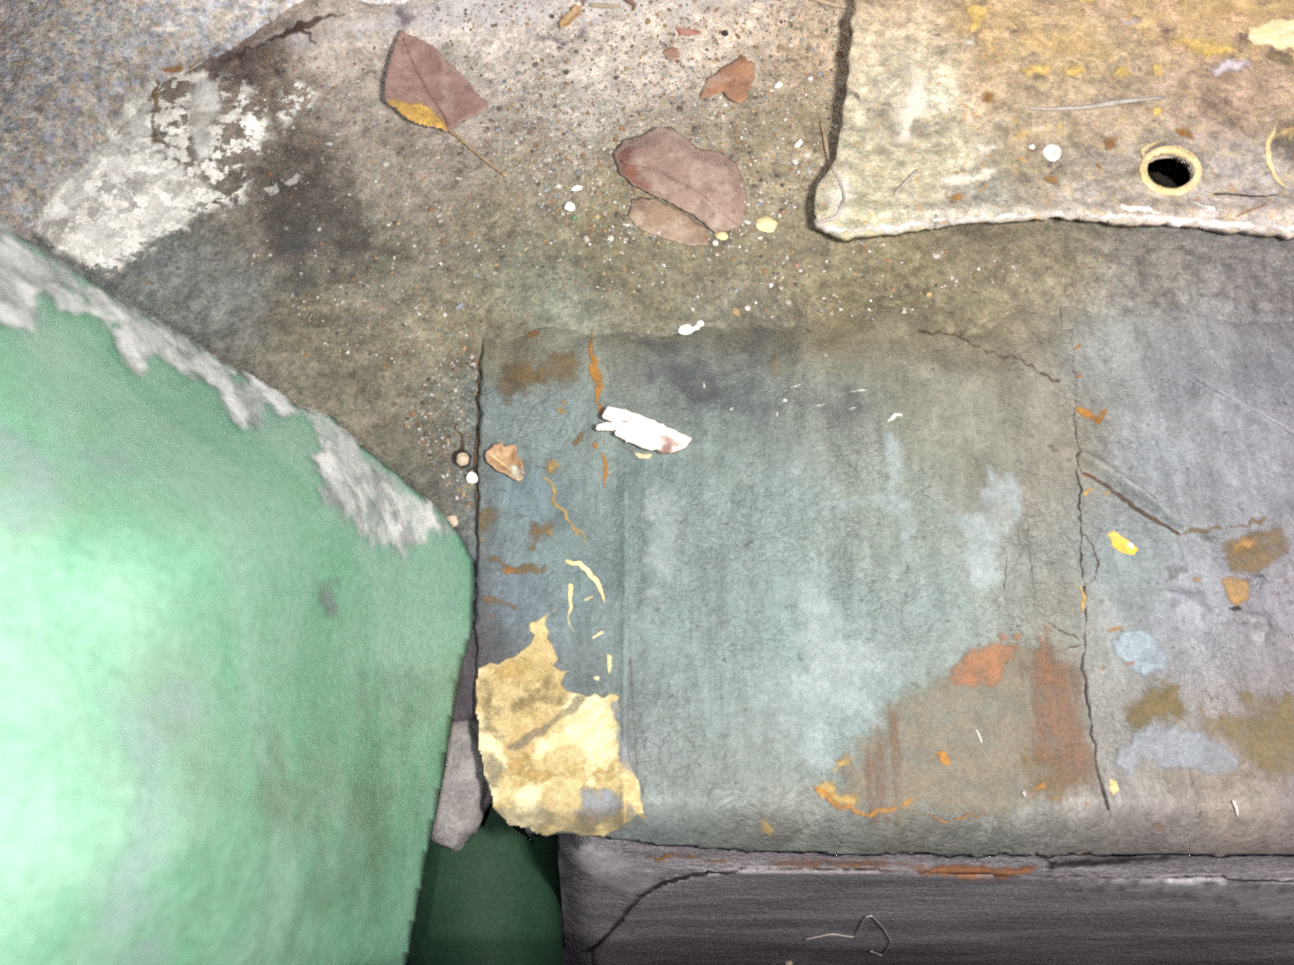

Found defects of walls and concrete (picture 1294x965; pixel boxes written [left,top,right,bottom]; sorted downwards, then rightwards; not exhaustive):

peeling [954,0,1108,76]
peeling [1126,0,1294,75]
peeling [895,76,927,142]
peeling [943,142,995,185]
rust [589,333,604,415]
rust [573,432,608,486]
rust [543,461,585,540]
rust [489,524,552,574]
crack [919,330,1110,811]
peeling [476,560,643,837]
crack [782,855,1292,882]
crack [589,867,743,953]